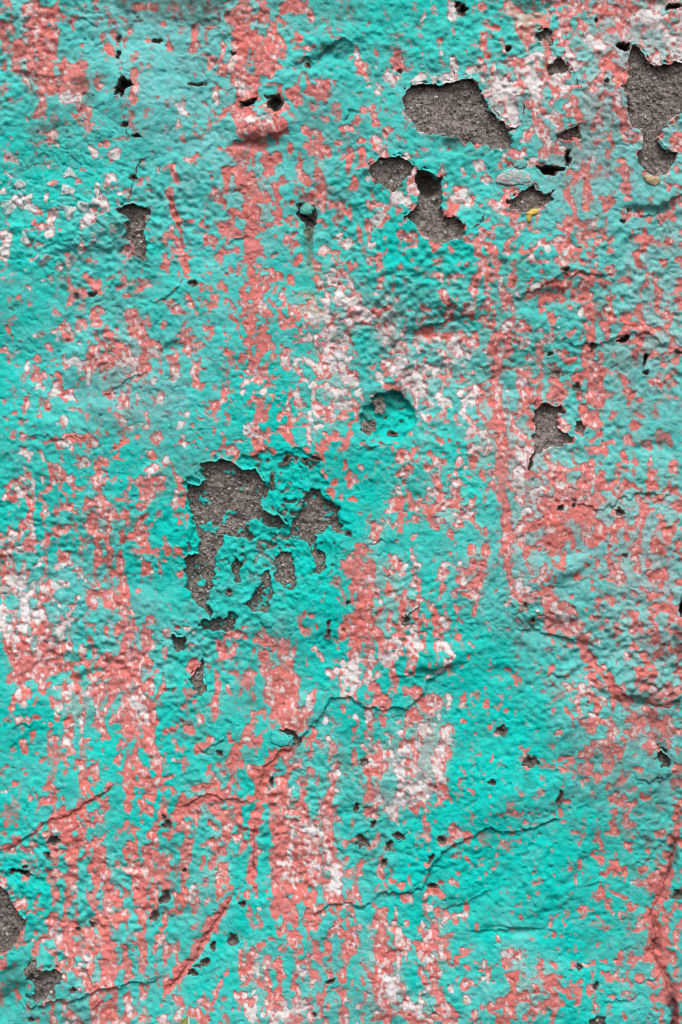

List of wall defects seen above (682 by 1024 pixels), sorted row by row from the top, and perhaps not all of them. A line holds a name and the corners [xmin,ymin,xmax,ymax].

spalling [397,68,532,150]
spalling [496,25,682,214]
spalling [117,201,151,261]
spalling [367,154,464,244]
peeling [490,305,630,589]
spalling [182,454,390,637]
peeling [246,552,301,712]
crack [224,663,451,878]
spalling [0,865,34,953]
peeling [23,900,140,1002]
crack [56,897,232,1003]
crack [308,818,559,916]